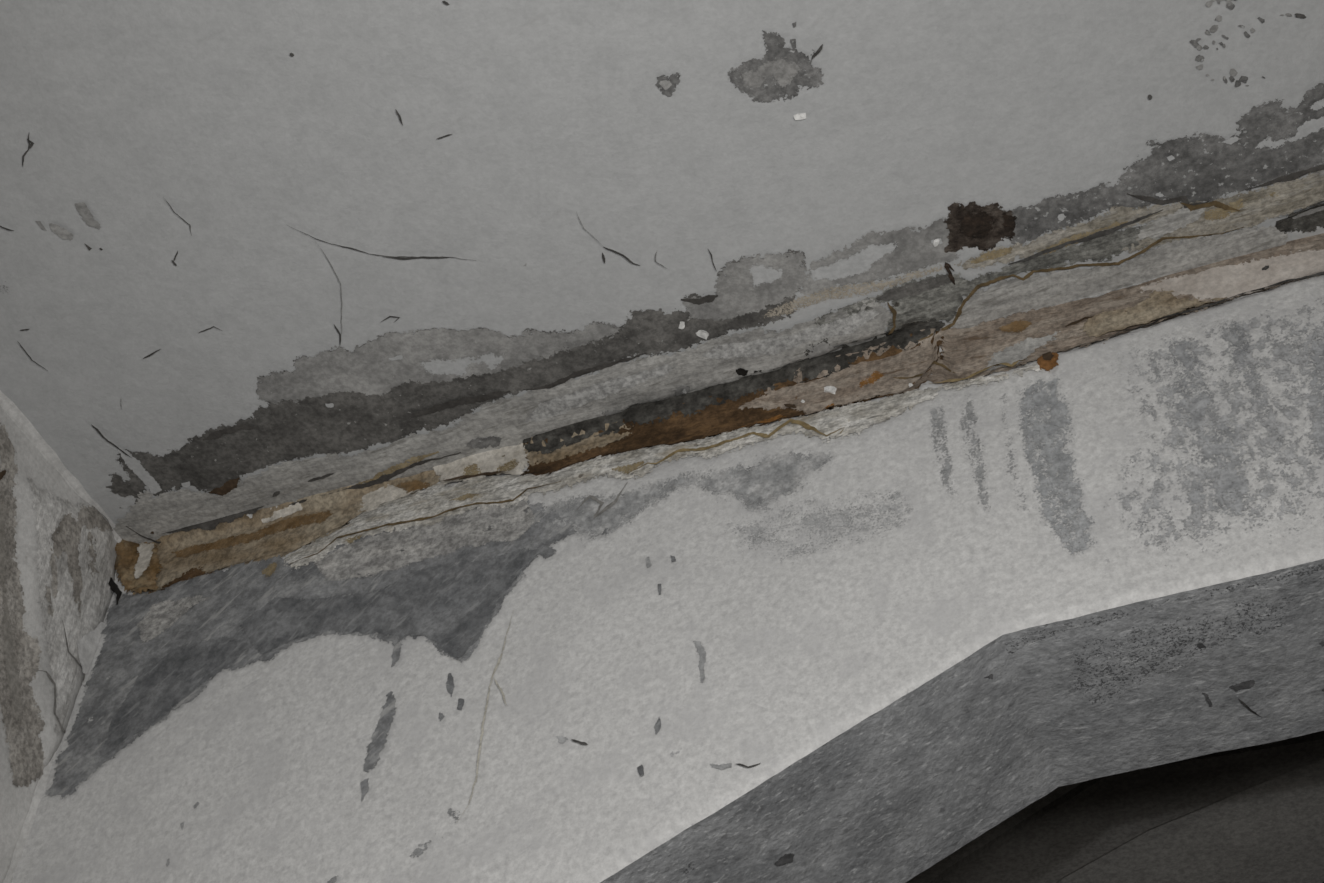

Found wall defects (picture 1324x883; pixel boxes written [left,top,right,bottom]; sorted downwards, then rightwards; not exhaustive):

peeling [655,72,681,97]
peeling [727,22,824,120]
peeling [1190,0,1265,87]
peeling [35,83,1324,801]
rust [521,328,955,476]
damp [930,395,996,510]
rust [1037,351,1059,372]
damp [1000,296,1324,574]
crack [1077,272,1324,346]
peeling [0,423,46,787]
damp [1006,564,1324,708]
peeling [774,853,794,866]